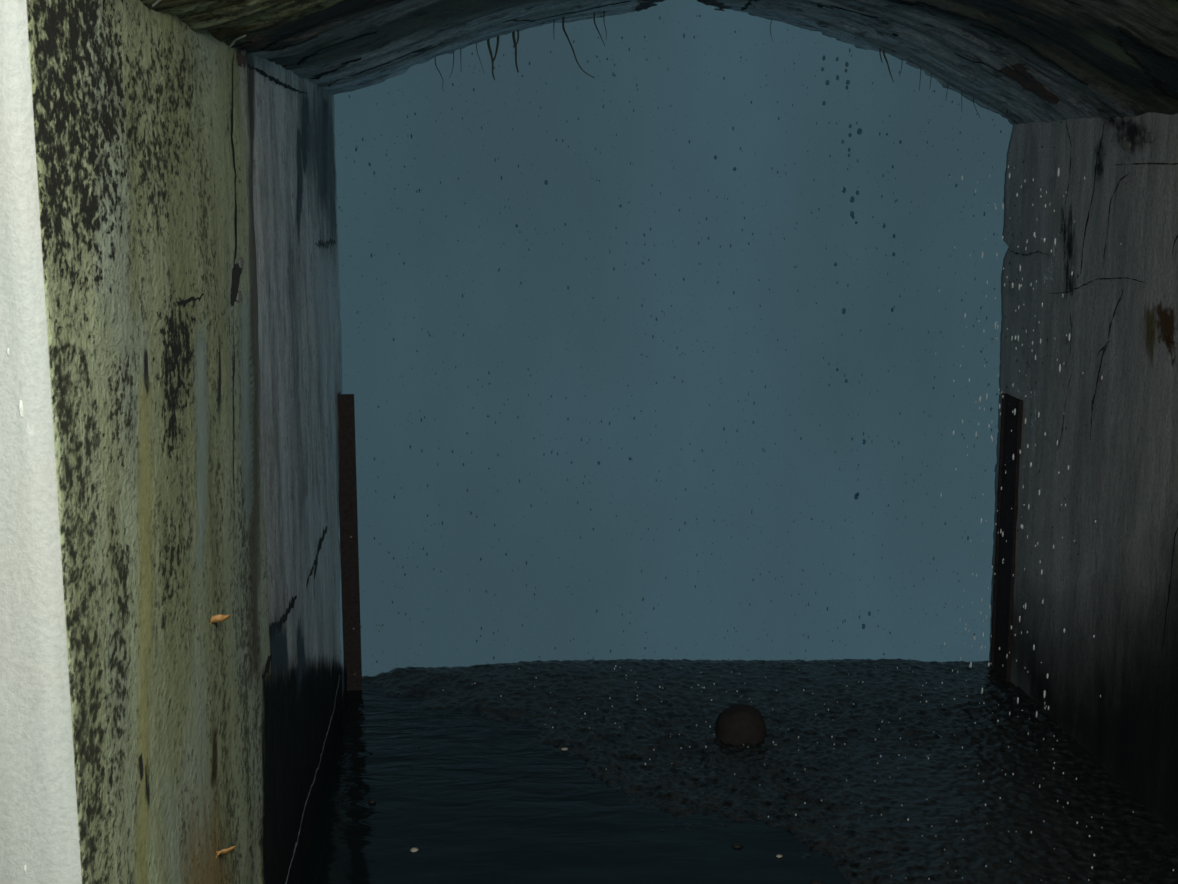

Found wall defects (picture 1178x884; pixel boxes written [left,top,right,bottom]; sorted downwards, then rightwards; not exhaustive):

crack [231,0,436,270]
crack [830,0,1088,86]
leakage [27,0,199,884]
crack [230,308,238,500]
crack [1052,122,1178,449]
rust [1146,303,1175,365]
crack [1161,513,1178,651]